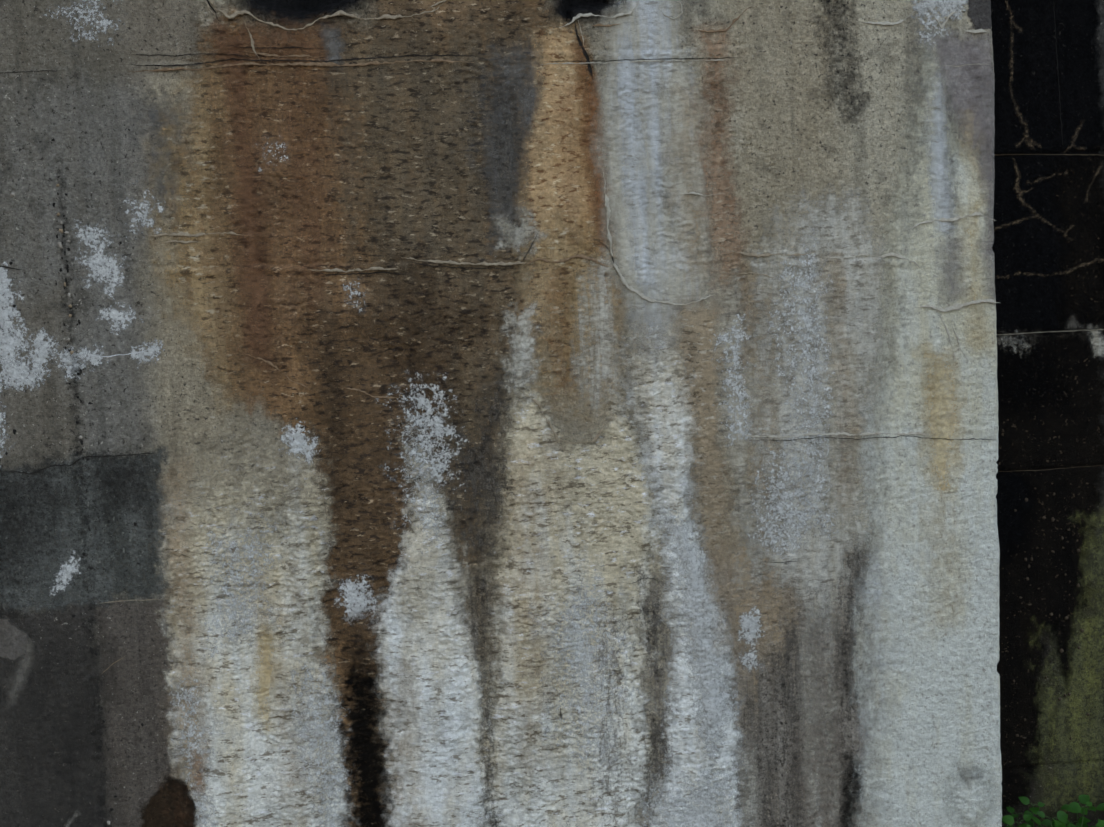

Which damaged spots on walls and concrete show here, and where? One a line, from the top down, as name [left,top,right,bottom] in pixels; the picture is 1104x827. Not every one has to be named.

leakage [45,0,120,47]
spalling [204,0,447,60]
spalling [552,0,639,44]
crack [994,1,1103,239]
leakage [58,201,143,335]
crack [997,259,1104,279]
leakage [0,262,109,425]
leakage [129,340,165,368]
leakage [281,421,321,465]
corrosion [165,0,621,827]
leakage [738,606,765,647]
leakage [0,633,110,827]